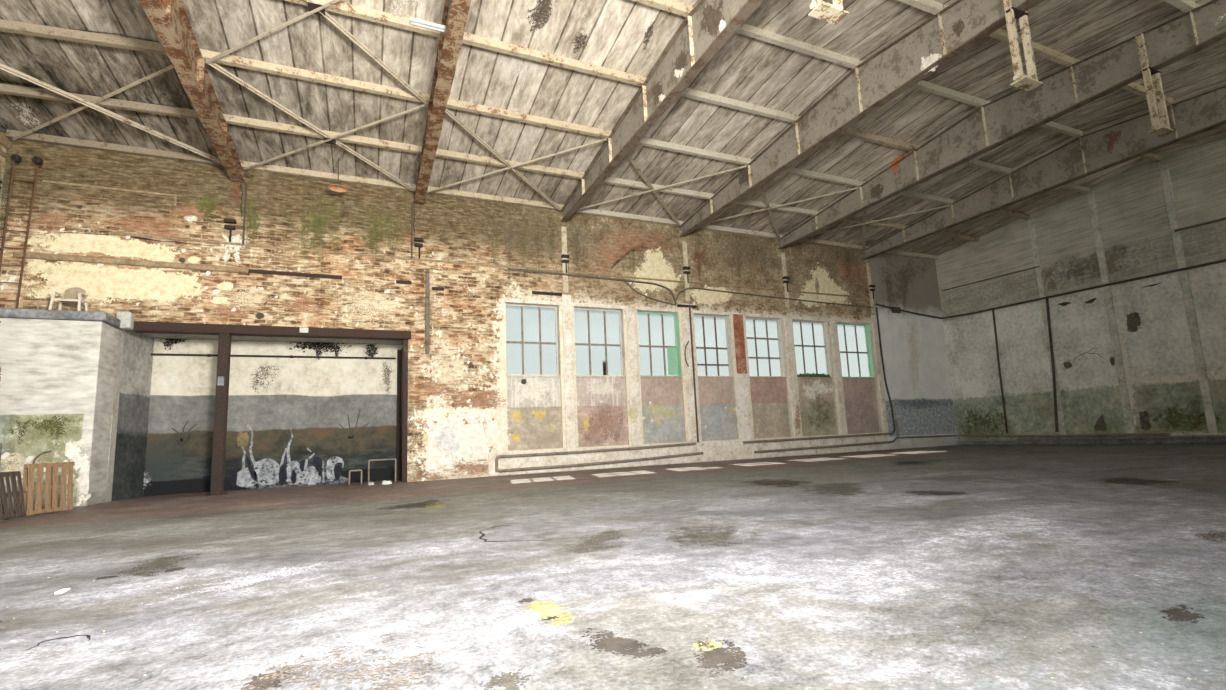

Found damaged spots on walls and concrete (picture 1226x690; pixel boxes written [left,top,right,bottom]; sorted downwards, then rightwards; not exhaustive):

spalling [168,203,207,229]
flaking render [8,228,316,319]
flaking render [333,289,413,326]
flaking render [586,227,735,306]
flaking render [795,262,851,308]
peeling [1110,311,1226,431]
leakage [1135,402,1226,436]